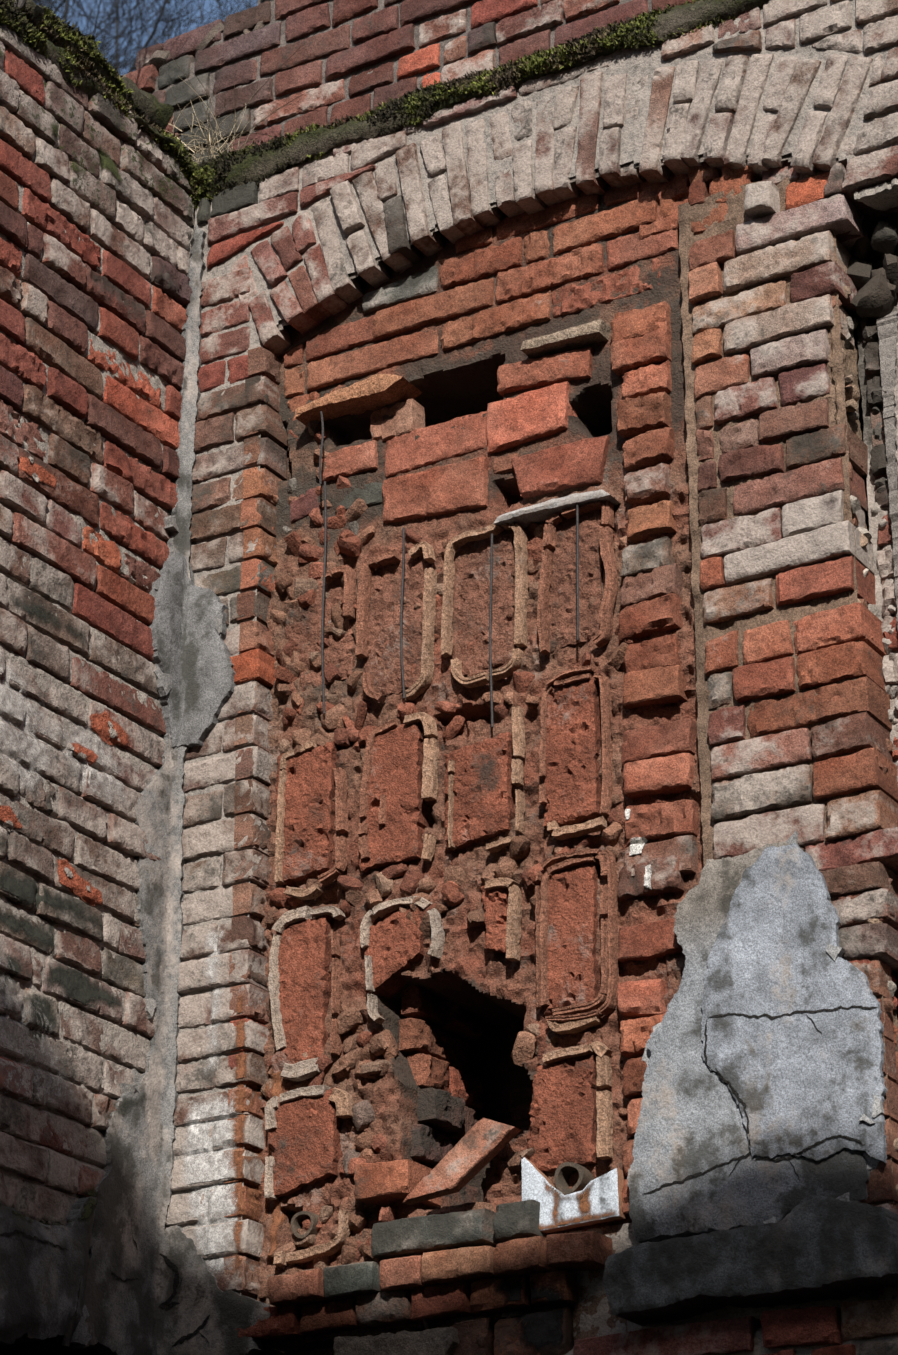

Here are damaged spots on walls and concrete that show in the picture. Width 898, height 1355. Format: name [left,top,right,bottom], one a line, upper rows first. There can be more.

peeling [0,224,272,1355]
crack [643,1005,898,1194]